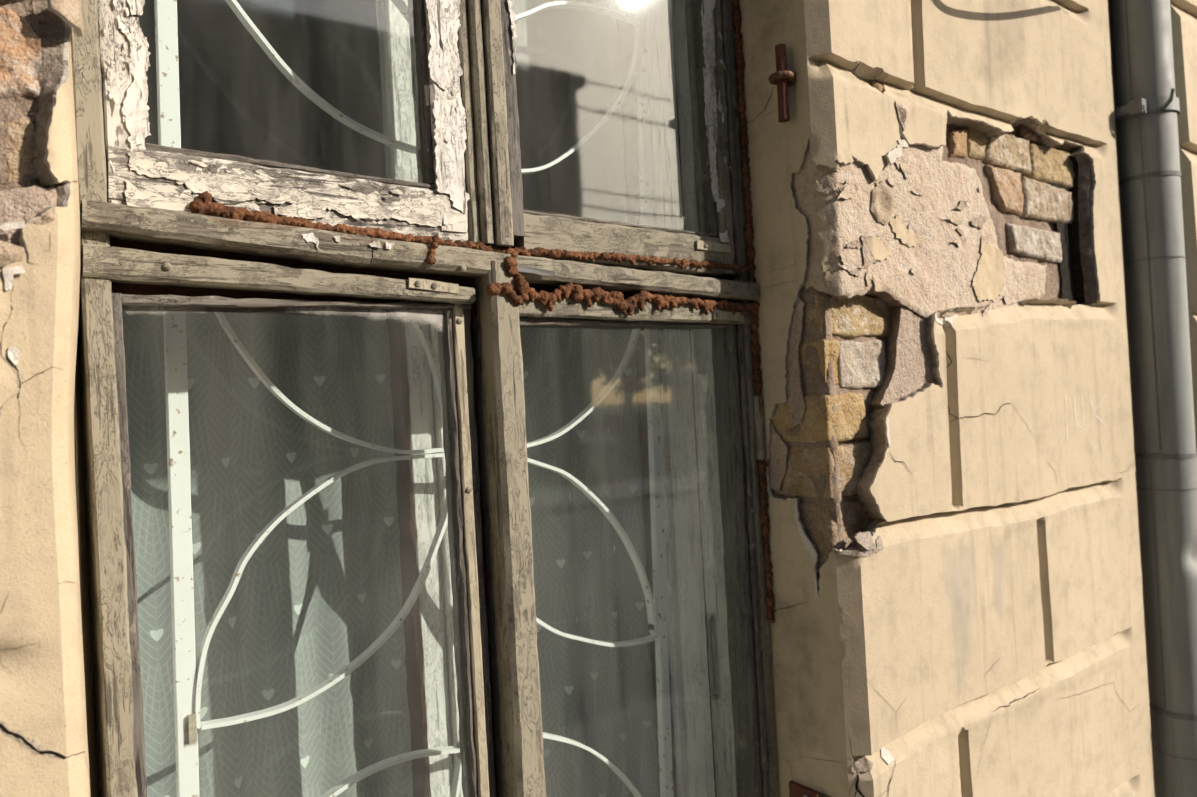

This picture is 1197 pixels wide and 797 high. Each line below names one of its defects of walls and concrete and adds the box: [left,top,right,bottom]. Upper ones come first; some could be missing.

flaking render [858,78,884,93]
flaking render [0,0,84,291]
peeling [7,346,20,366]
crack [0,228,63,448]
flaking render [767,101,1097,599]
crack [948,403,1057,478]
crack [0,721,88,766]
crack [785,735,896,797]